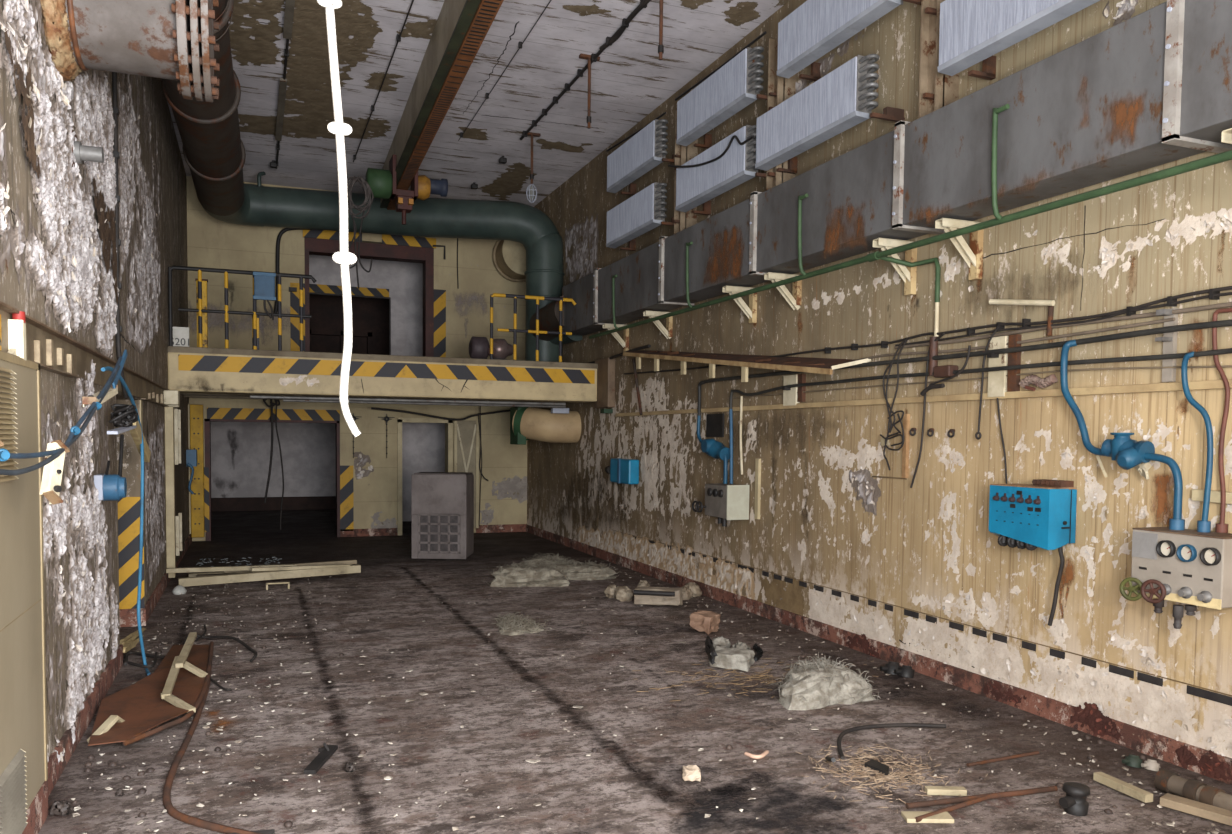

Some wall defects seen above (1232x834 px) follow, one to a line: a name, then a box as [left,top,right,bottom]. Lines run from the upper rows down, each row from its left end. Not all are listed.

spalling [562,0,611,17]
spalling [680,0,790,26]
spalling [228,0,437,139]
spalling [481,162,537,201]
spalling [536,139,593,153]
corrosion [1105,97,1143,158]
corrosion [824,206,865,258]
crack [983,205,1164,311]
peeling [1023,208,1232,279]
peeling [0,0,162,763]
peeling [144,420,166,588]
peeling [557,373,1232,780]